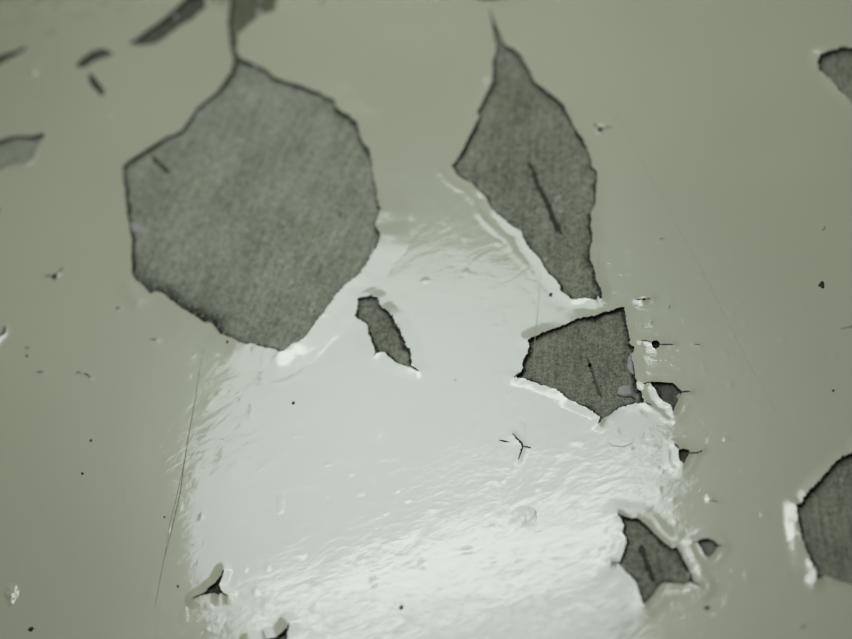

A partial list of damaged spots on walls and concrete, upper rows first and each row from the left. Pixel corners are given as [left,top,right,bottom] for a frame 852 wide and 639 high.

peeling [817,46,852,102]
peeling [0,133,45,170]
peeling [123,0,381,352]
peeling [452,0,602,300]
peeling [355,295,419,371]
peeling [514,307,690,424]
peeling [192,570,228,599]
peeling [610,513,700,604]
peeling [796,453,852,584]